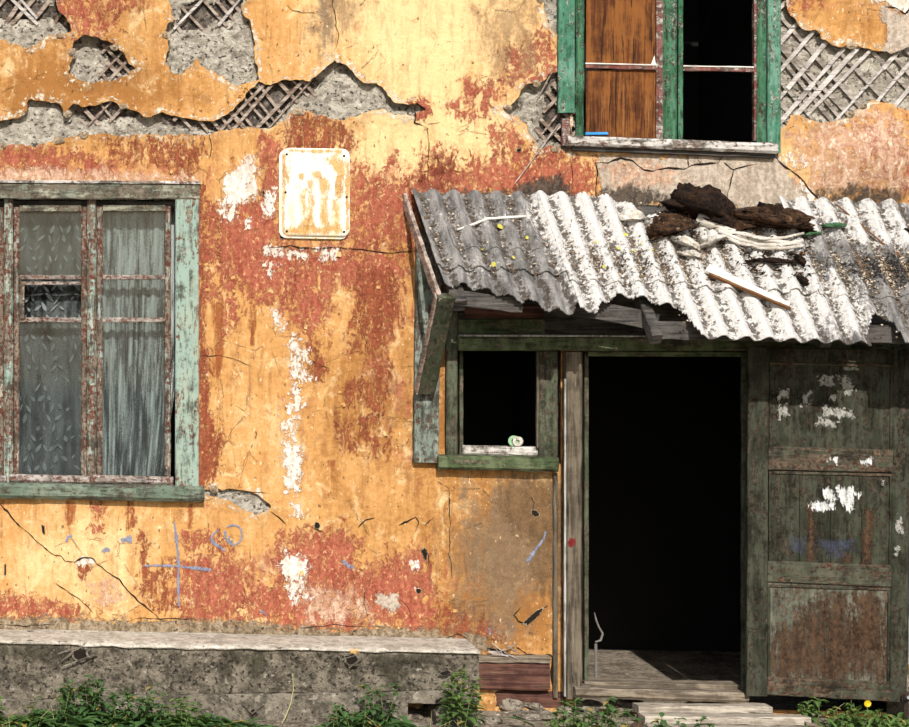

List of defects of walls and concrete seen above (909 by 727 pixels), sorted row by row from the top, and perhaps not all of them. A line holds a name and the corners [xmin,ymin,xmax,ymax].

rust [282,149,350,235]
crack [595,156,751,197]
crack [777,159,818,199]
flaking render [0,0,909,526]
crack [0,504,198,621]
flaking render [0,500,507,654]
crack [304,594,368,628]